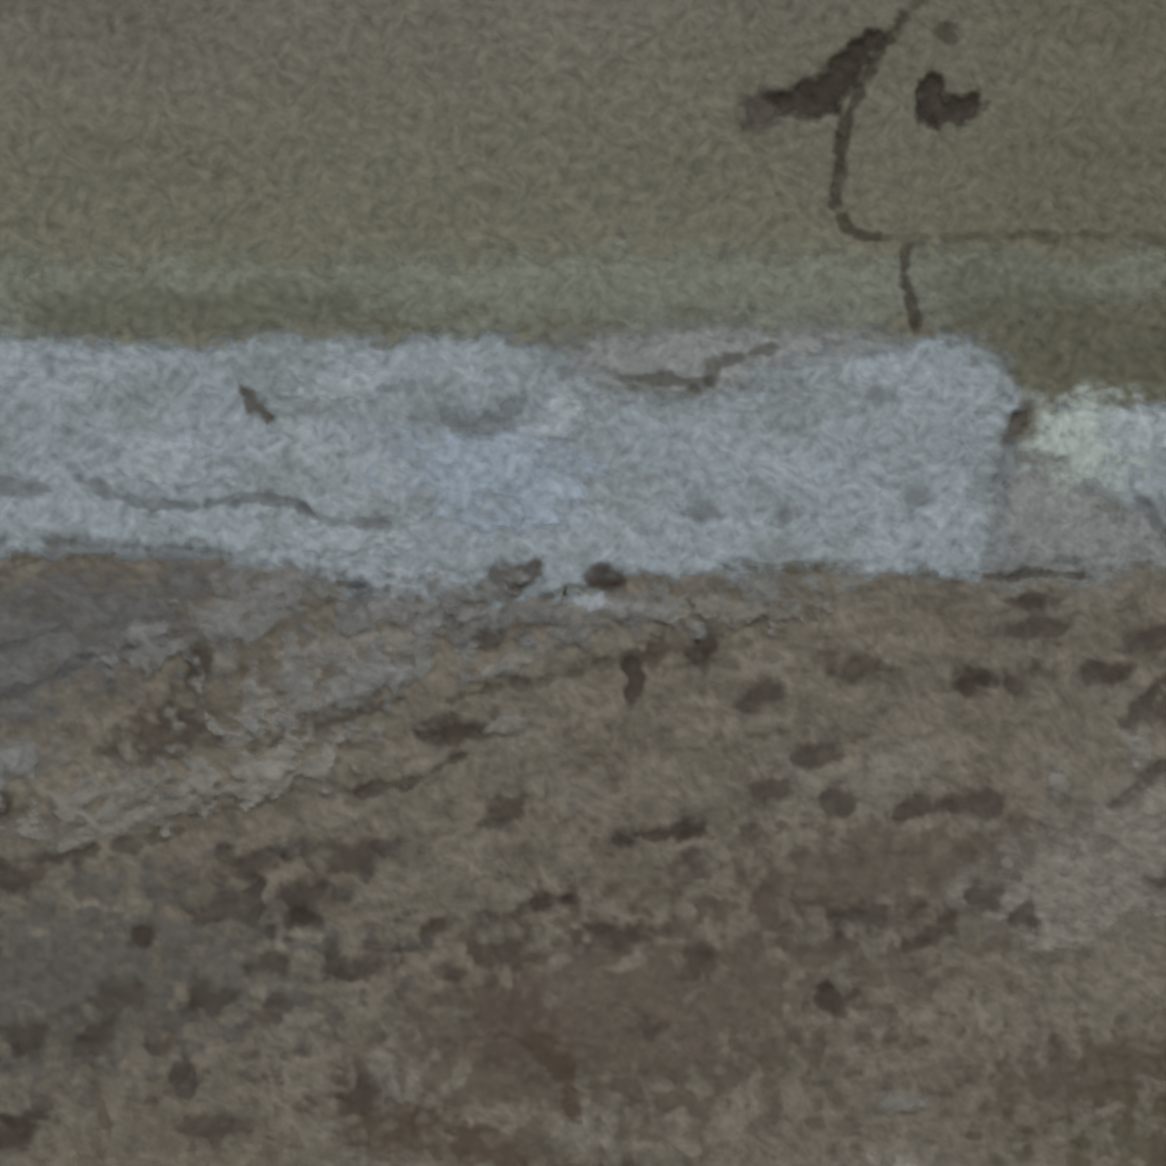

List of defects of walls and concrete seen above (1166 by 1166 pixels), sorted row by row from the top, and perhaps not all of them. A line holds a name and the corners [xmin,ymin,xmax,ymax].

spalling [741,29,885,129]
crack [831,13,921,330]
spalling [916,73,980,129]
spalling [0,319,1166,1166]